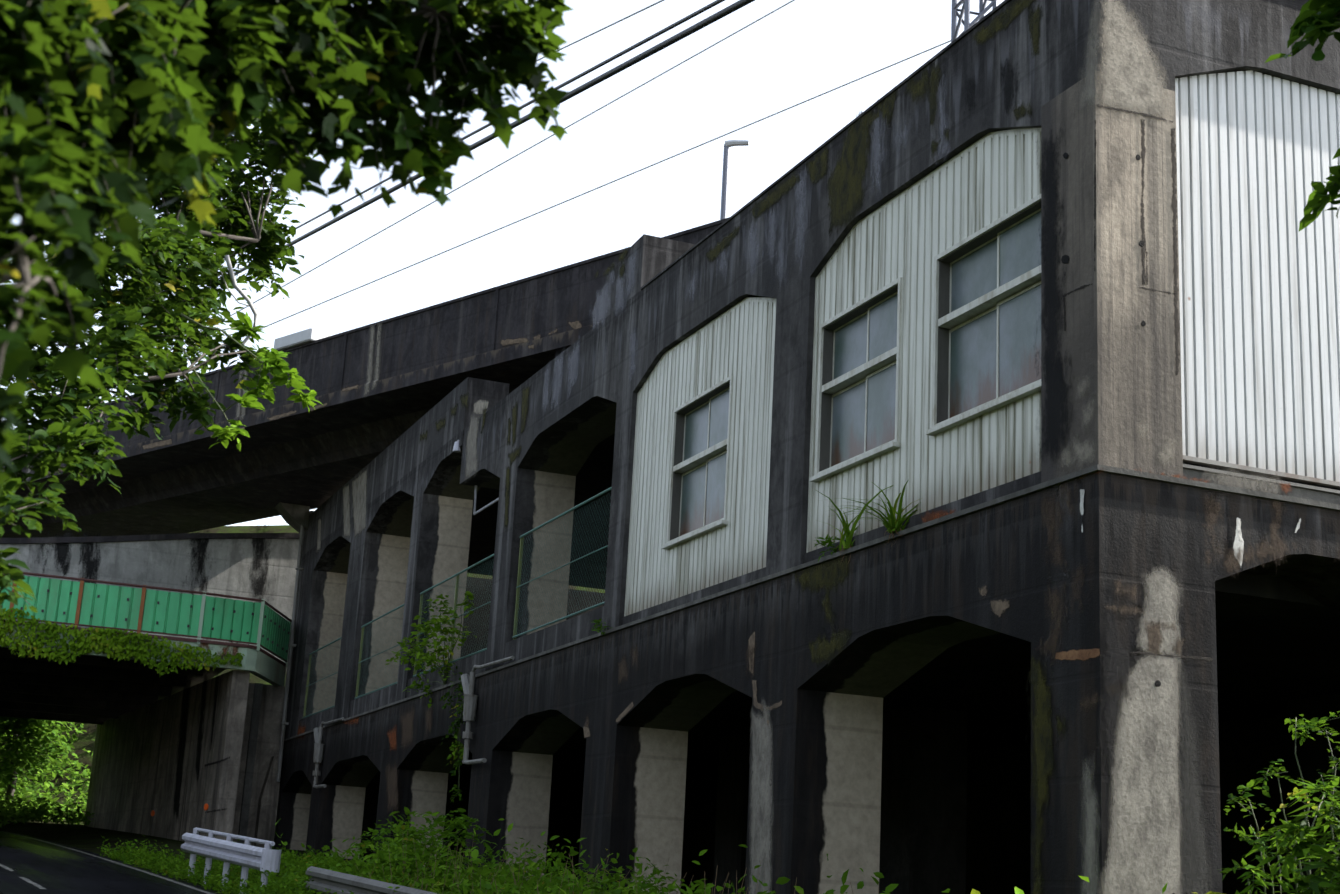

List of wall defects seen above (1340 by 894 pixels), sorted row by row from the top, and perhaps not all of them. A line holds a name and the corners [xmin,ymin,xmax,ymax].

water stain [1039,137,1072,459]
crack [1062,104,1180,375]
water stain [186,528,209,595]
water stain [249,525,270,603]
spalling [1055,648,1100,661]
water stain [1080,615,1129,768]
water stain [1146,622,1183,656]
water stain [750,701,774,894]